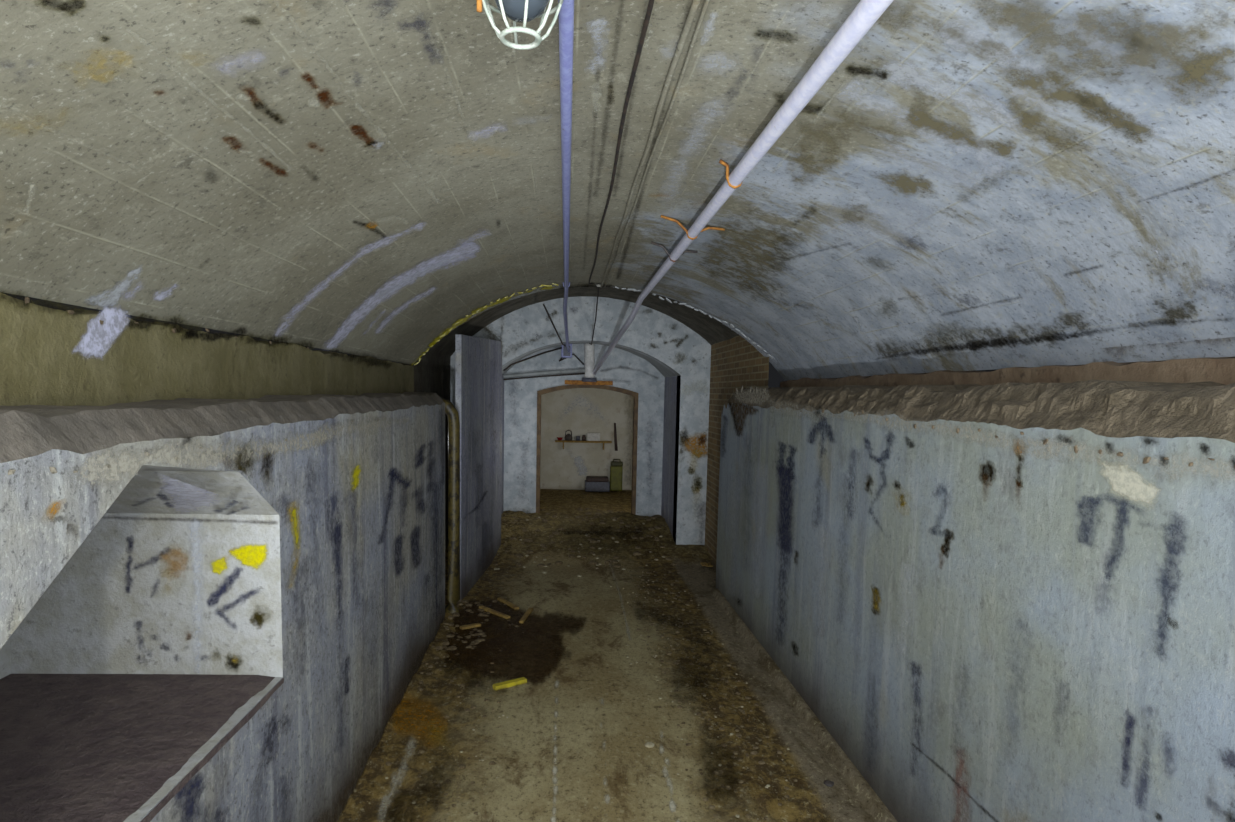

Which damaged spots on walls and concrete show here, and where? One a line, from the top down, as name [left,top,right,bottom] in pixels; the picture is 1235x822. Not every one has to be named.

corrosion [239,88,283,124]
corrosion [302,73,333,109]
corrosion [223,137,242,153]
corrosion [351,125,377,147]